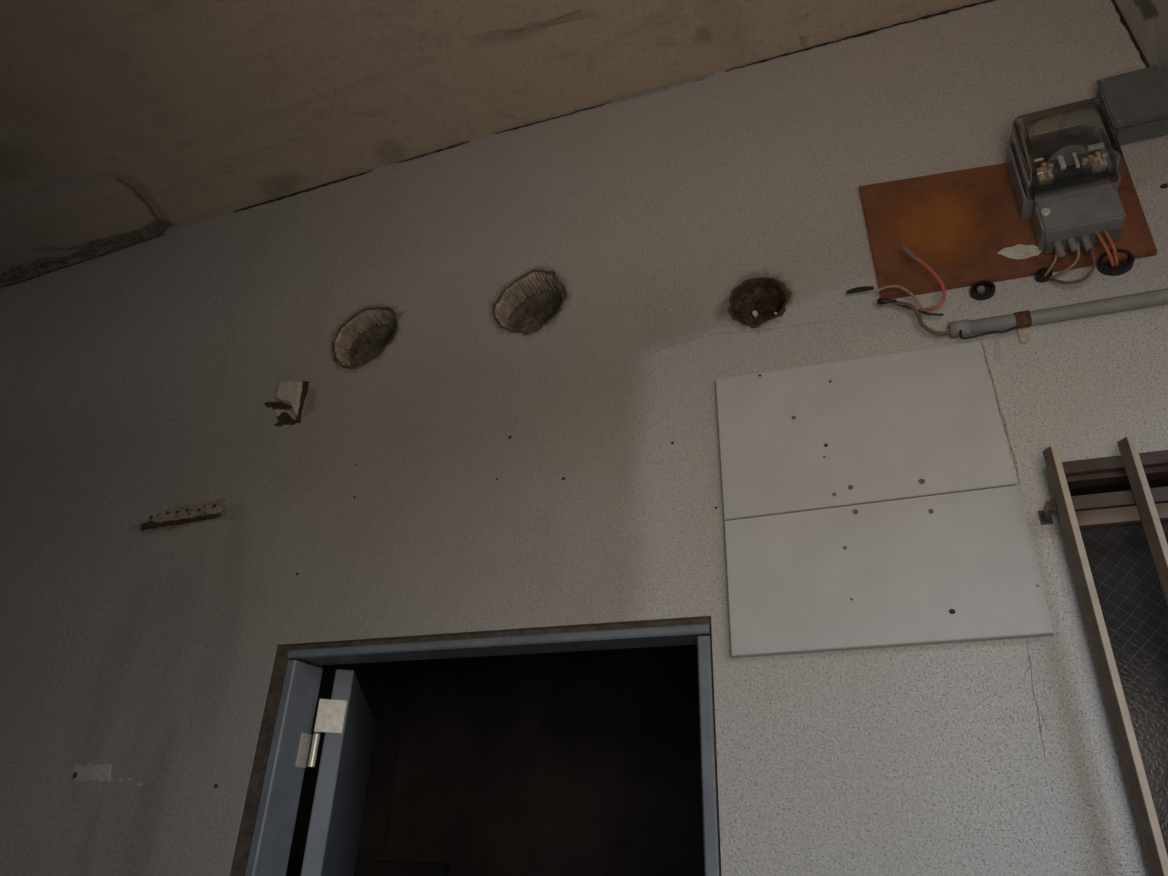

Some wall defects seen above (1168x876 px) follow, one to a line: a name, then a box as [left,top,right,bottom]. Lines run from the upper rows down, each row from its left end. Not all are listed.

spalling [0,177,176,284]